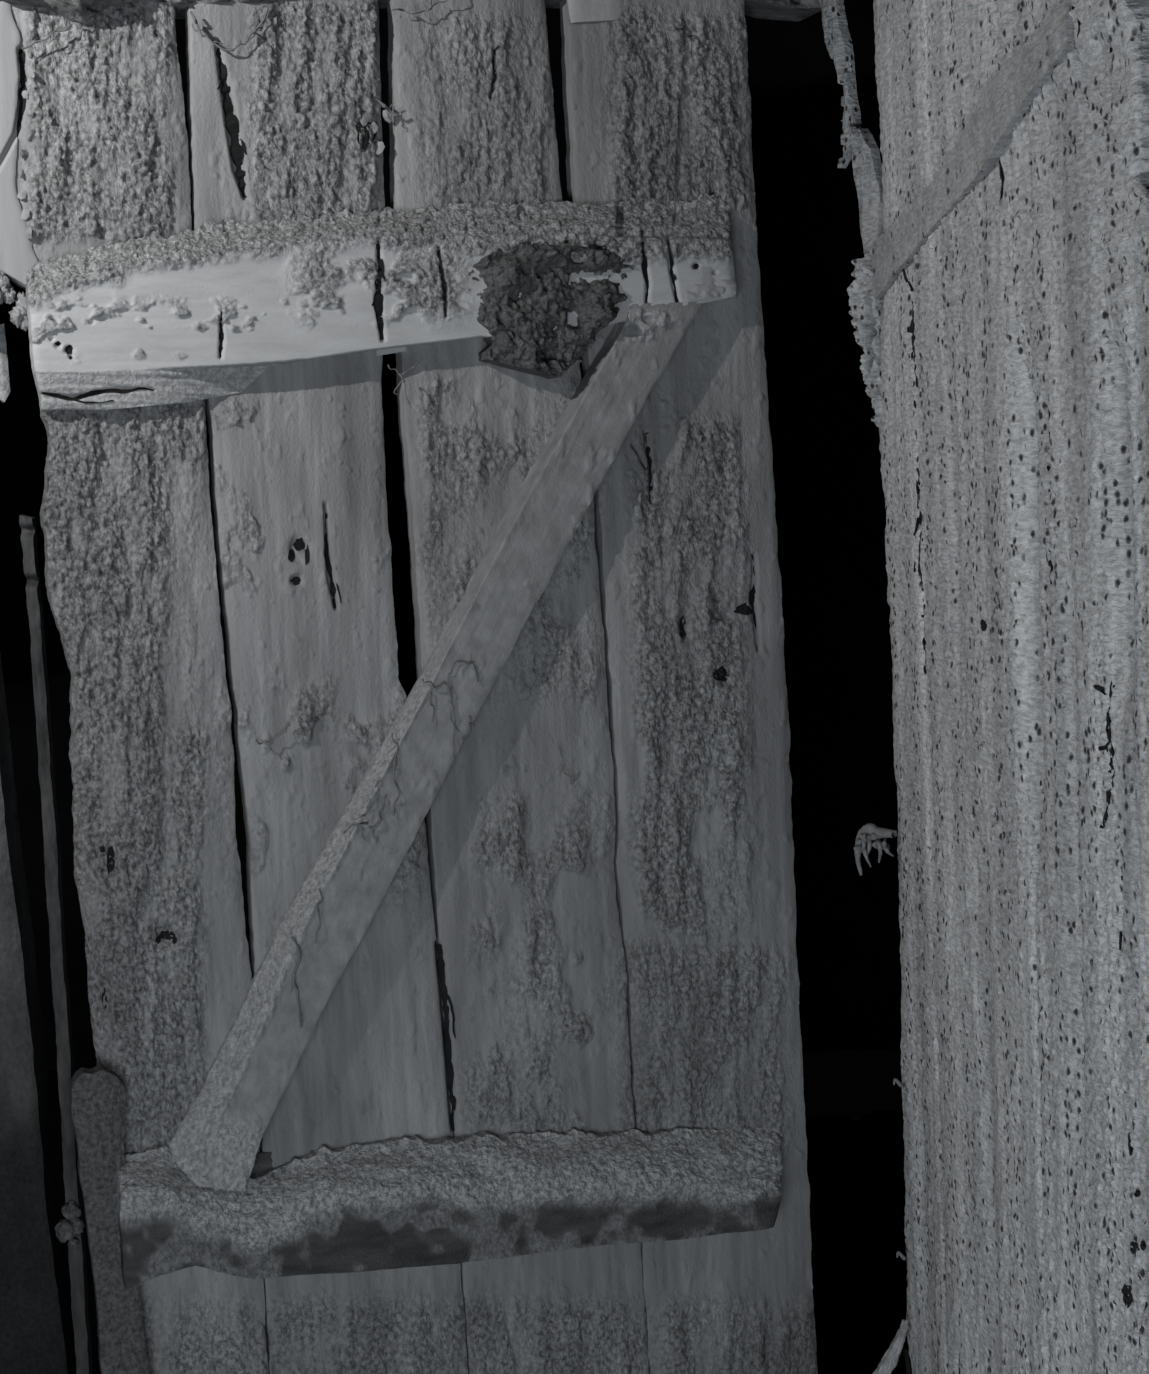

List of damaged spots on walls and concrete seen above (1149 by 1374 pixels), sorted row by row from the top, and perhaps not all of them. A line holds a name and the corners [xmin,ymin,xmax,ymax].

crack [902,269,918,408]
crack [913,471,927,674]